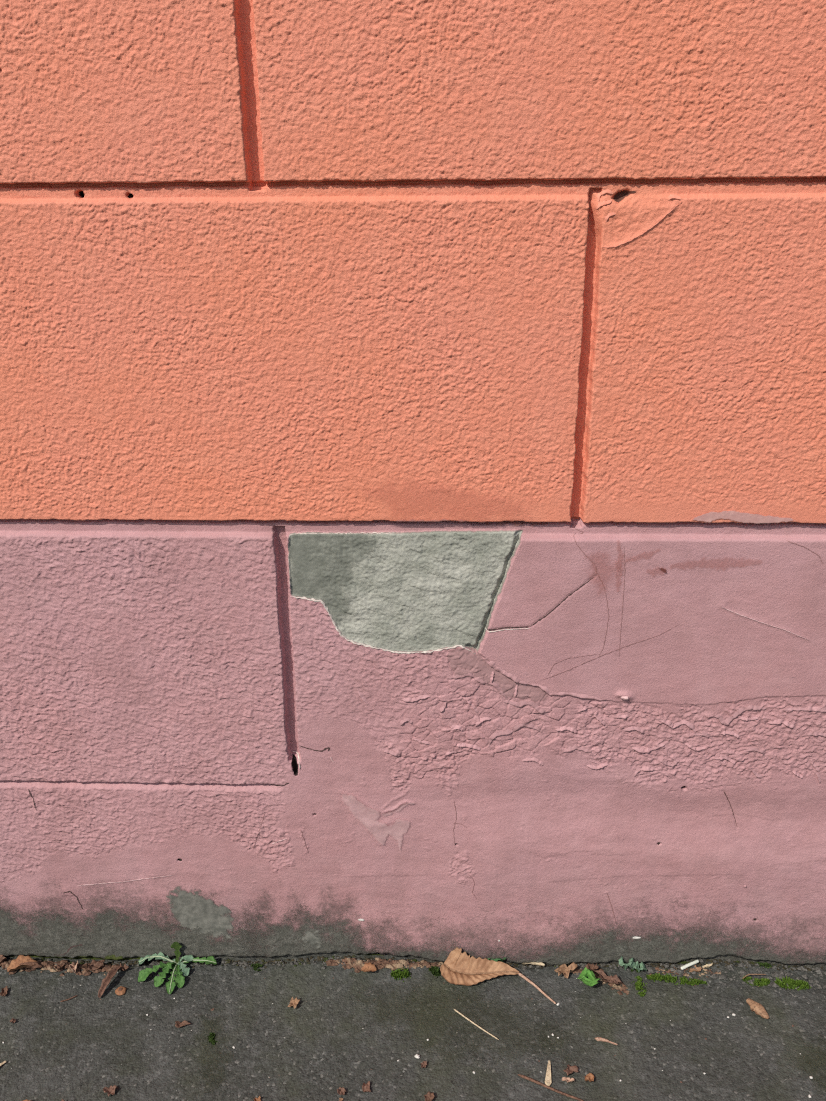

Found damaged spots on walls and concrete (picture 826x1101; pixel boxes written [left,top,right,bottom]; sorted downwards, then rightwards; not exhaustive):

flaking render [596,189,636,222]
flaking render [288,530,646,755]
crack [485,522,678,679]
peeling [655,705,826,754]